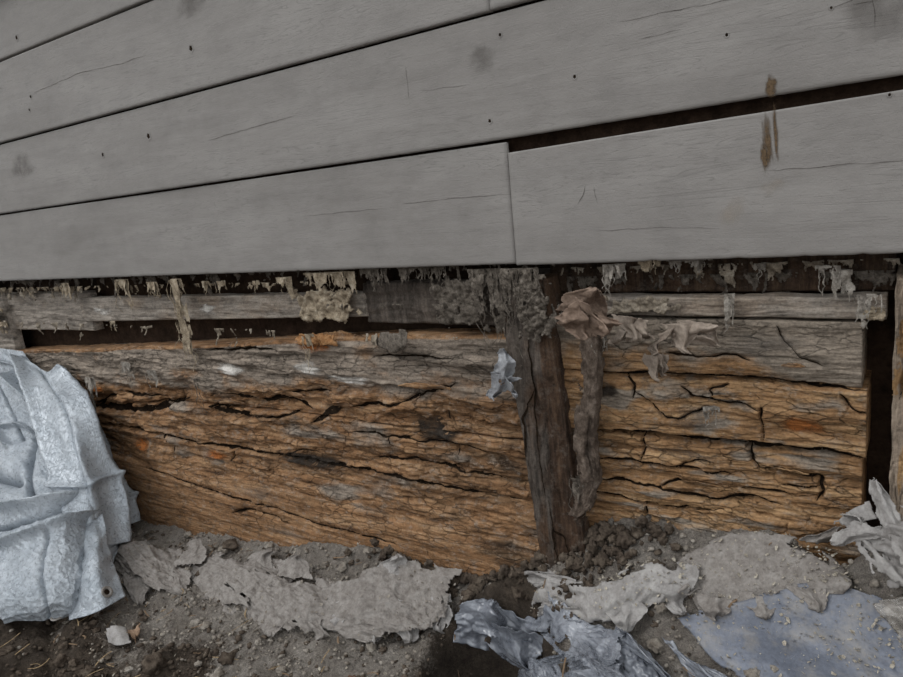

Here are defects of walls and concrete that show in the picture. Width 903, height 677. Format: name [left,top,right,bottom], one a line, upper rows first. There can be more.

crack [621,0,724,40]
rust [766,78,777,96]
crack [765,161,896,171]
spalling [317,330,356,340]
peeling [376,329,408,353]
crack [597,325,869,512]
crack [91,340,570,565]